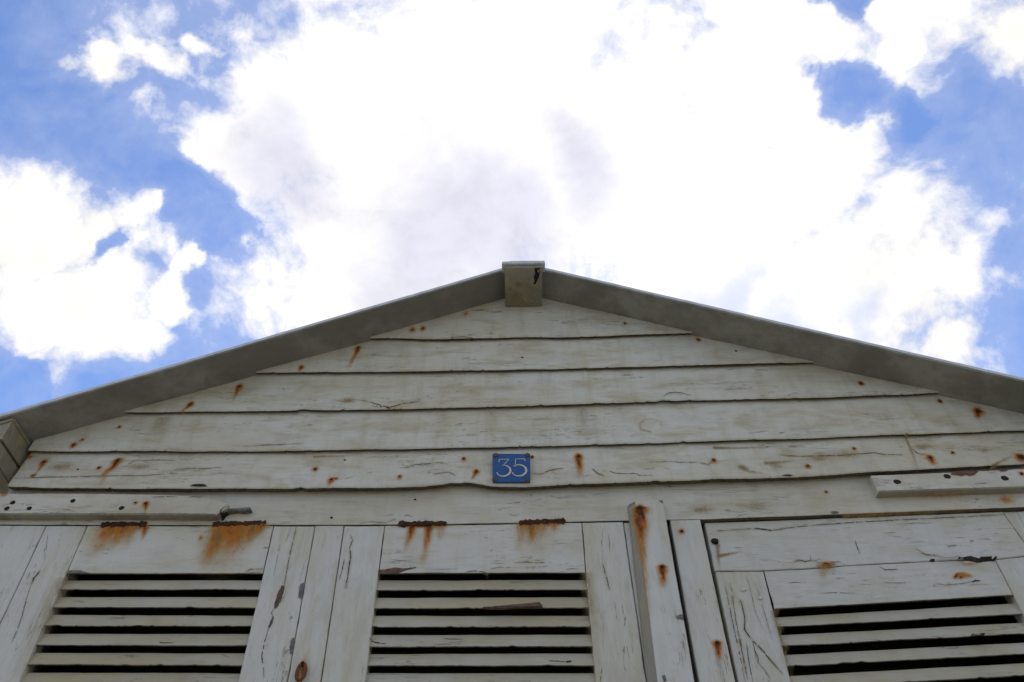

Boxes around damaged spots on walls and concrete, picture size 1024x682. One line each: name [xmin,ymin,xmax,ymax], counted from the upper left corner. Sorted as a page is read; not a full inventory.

corrosion [97,457,123,475]
corrosion [98,524,148,547]
corrosion [199,524,265,559]
corrosion [632,504,667,584]
peeling [930,554,997,563]
crack [725,581,782,681]
corrosion [713,640,722,658]